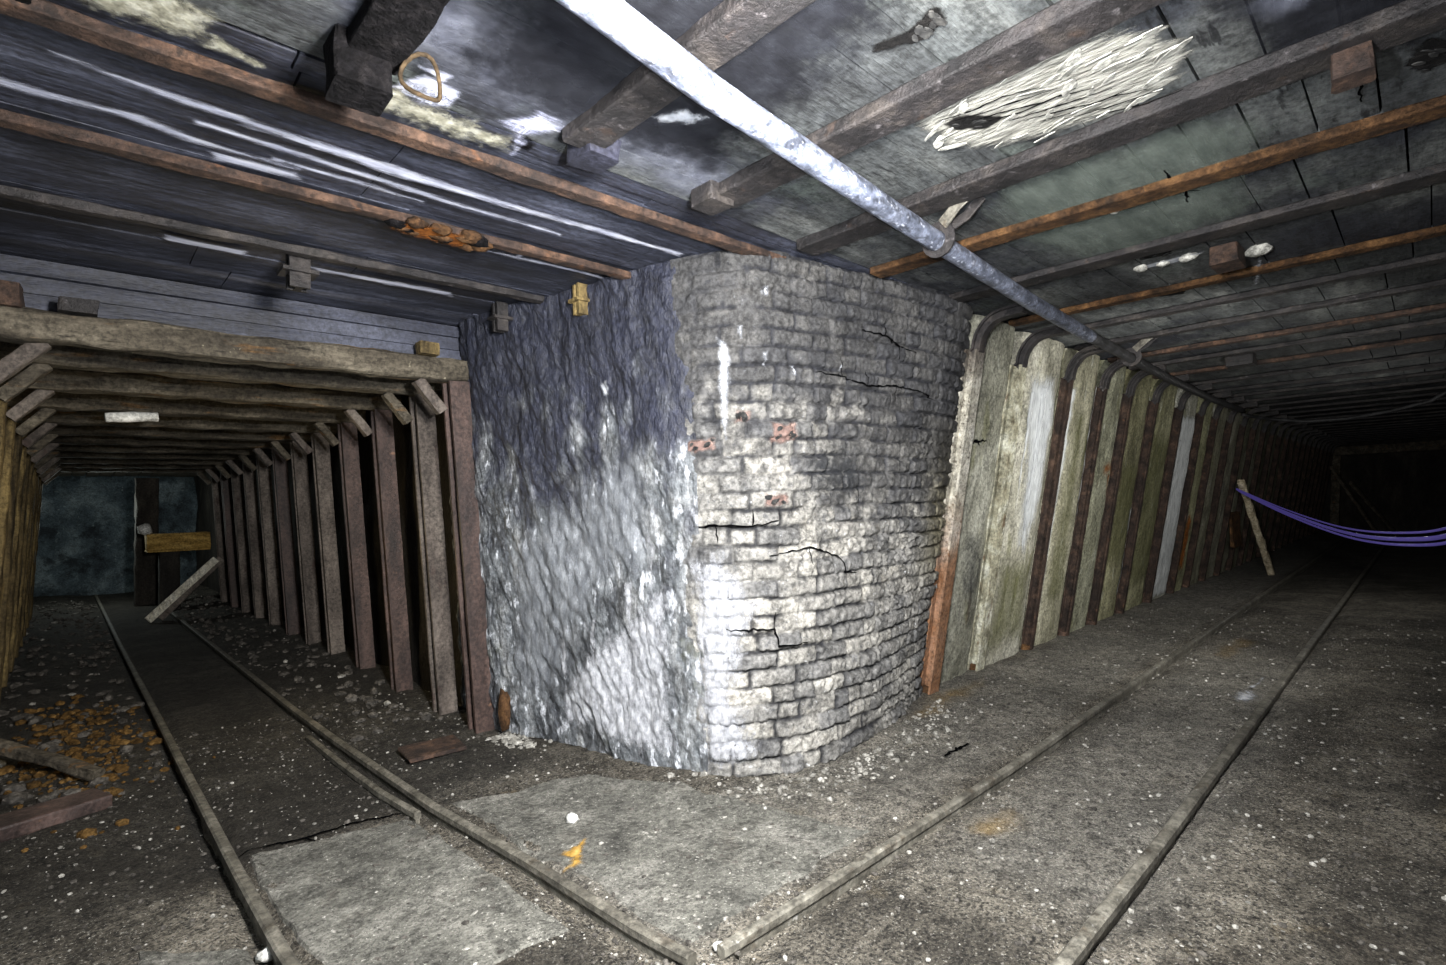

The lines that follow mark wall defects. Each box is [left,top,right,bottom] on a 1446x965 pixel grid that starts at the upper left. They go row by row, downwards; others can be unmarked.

rust [383,216,493,252]